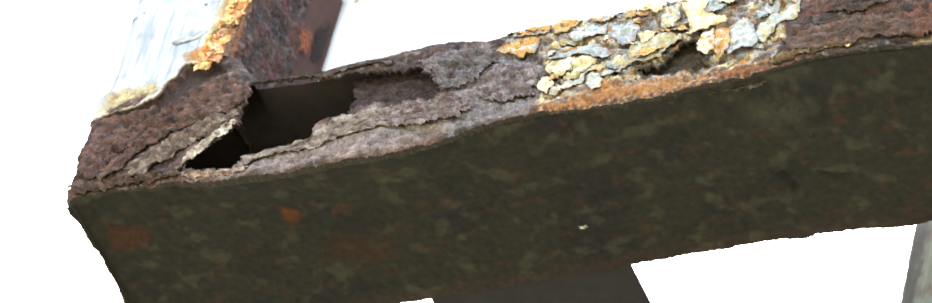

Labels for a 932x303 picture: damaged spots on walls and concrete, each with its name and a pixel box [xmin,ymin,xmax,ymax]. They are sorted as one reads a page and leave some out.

rust [67,0,252,195]
rust [297,28,313,54]
peeling [348,0,801,127]
rust [544,0,932,109]